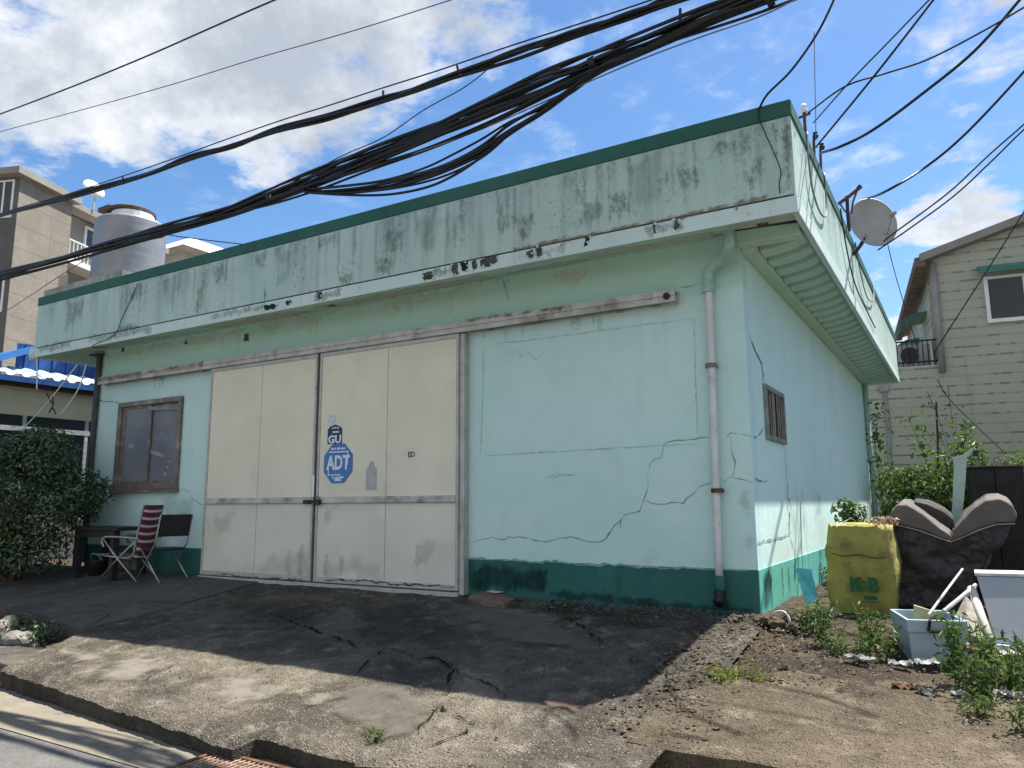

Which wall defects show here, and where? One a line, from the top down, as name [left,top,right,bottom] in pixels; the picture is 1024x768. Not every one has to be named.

peeling [204,215,796,341]
rust [513,195,766,251]
crack [470,318,796,556]